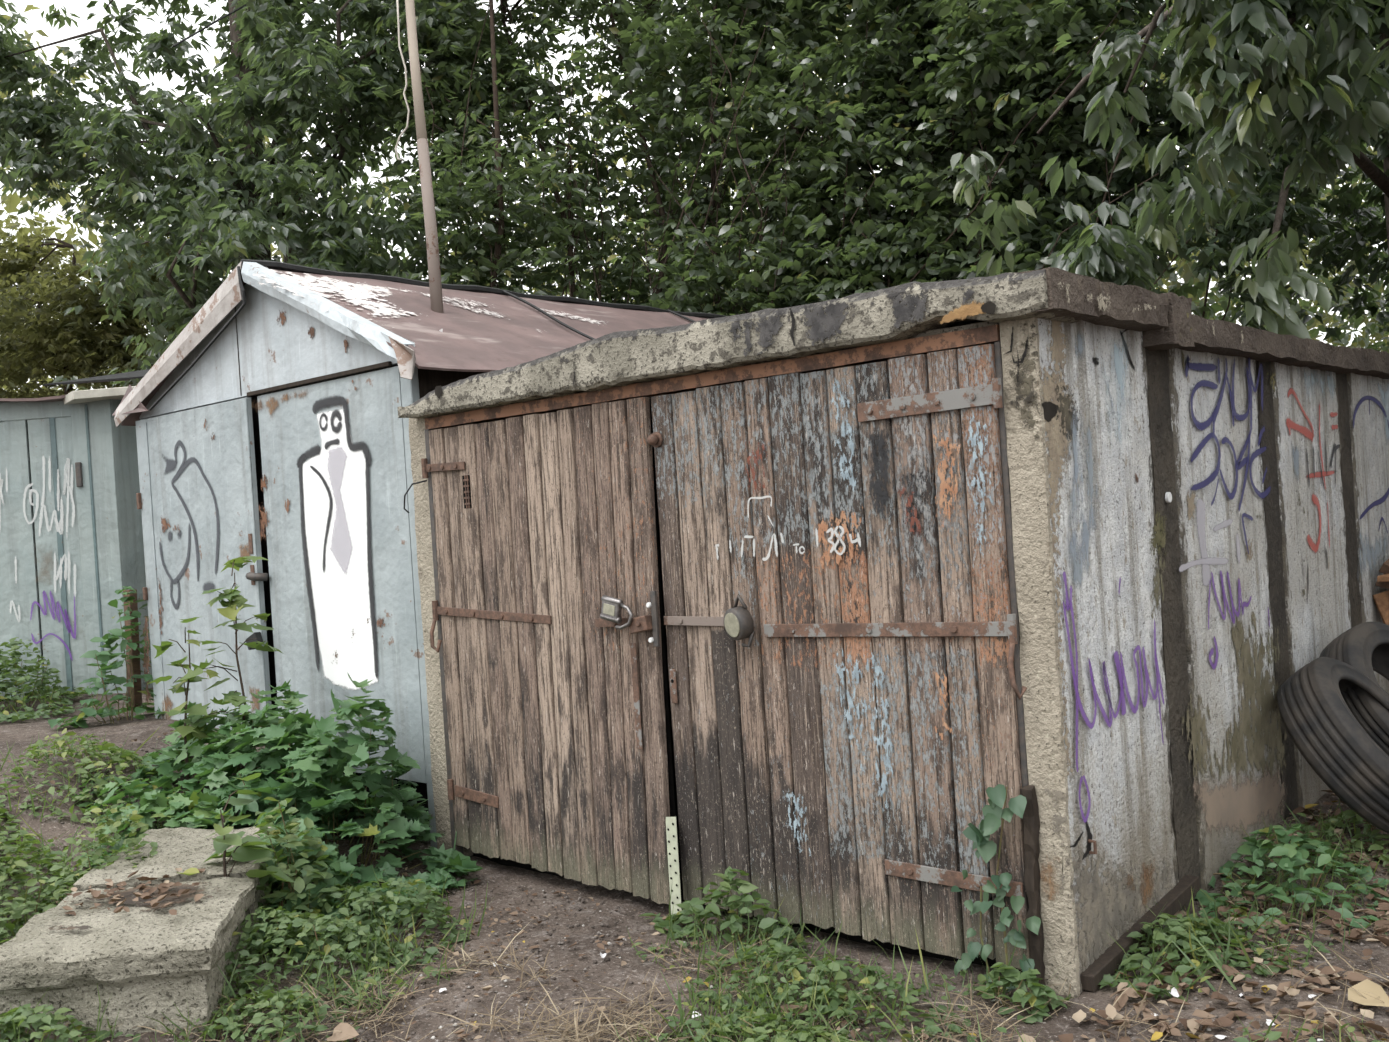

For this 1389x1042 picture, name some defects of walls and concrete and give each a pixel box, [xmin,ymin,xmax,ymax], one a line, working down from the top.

leakage [727,309,783,357]
leakage [800,296,850,346]
leakage [889,290,929,328]
leakage [957,286,975,305]
spalling [940,301,996,324]
corrosion [257,393,306,415]
peeling [814,373,993,574]
leakage [1193,770,1285,837]